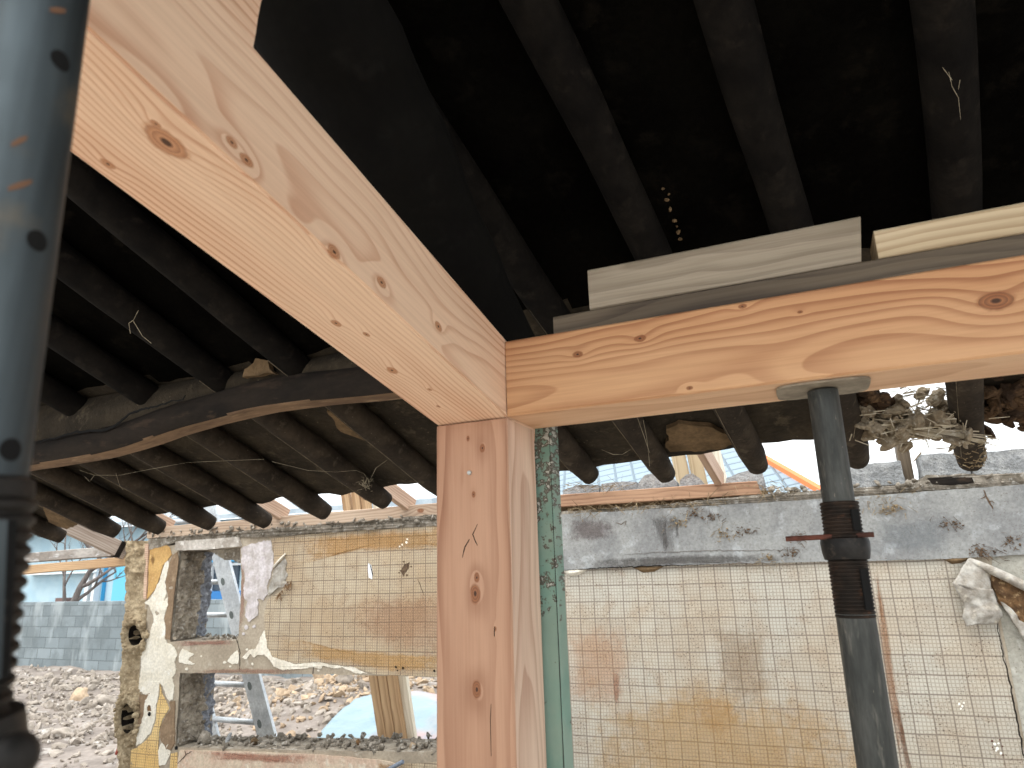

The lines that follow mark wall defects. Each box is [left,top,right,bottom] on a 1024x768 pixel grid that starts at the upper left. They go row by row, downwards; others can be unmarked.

peeling [241,540,292,635]
spalling [113,541,202,768]
peeling [223,648,254,667]